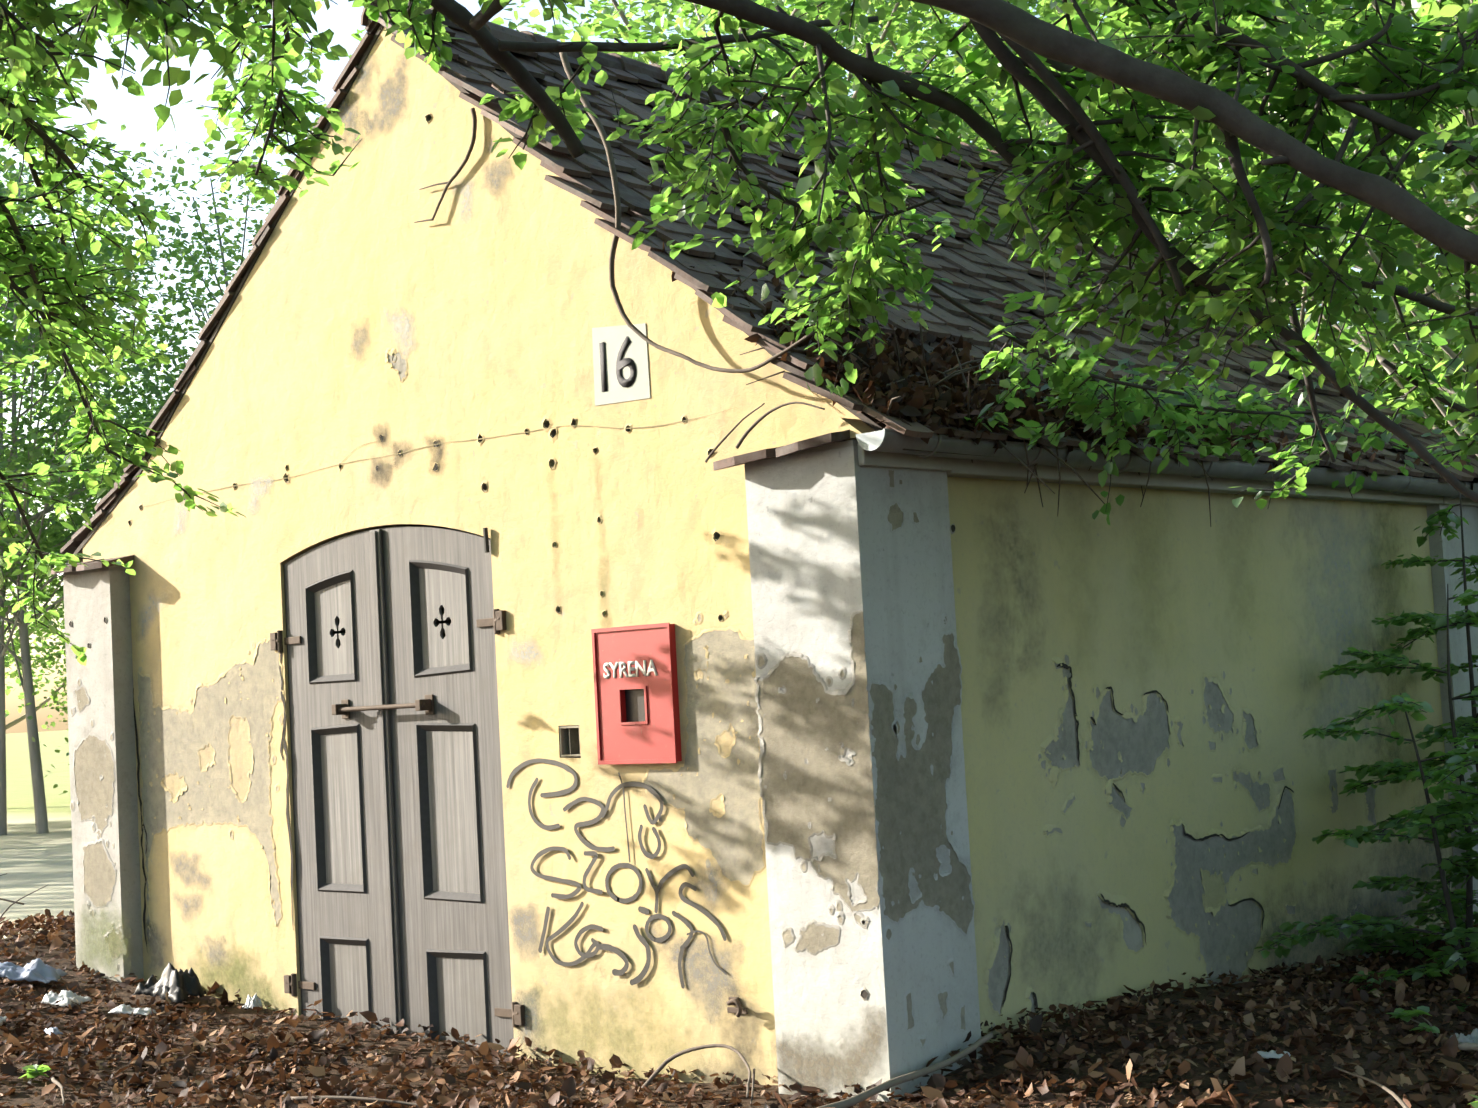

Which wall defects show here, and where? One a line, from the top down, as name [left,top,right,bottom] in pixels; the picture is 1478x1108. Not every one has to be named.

peeling [70,677,127,971]
peeling [136,638,285,943]
peeling [642,610,975,955]
peeling [982,919,1039,1033]
peeling [1036,652,1297,987]